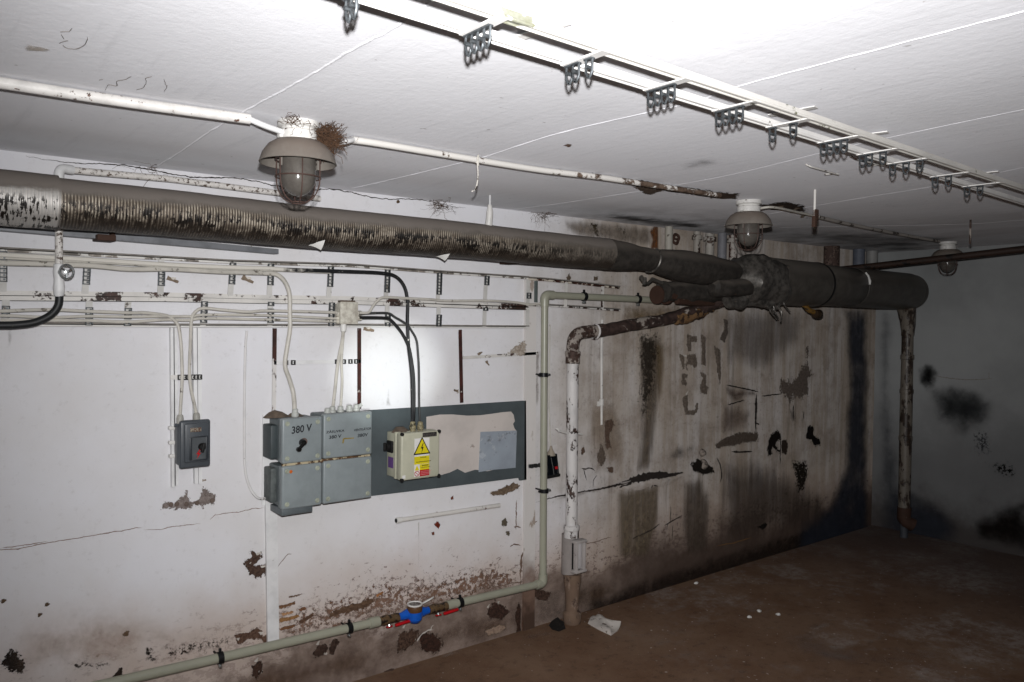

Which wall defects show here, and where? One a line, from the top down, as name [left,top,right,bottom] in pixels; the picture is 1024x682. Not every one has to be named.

peeling [679,319,728,415]
damp [579,313,867,610]
flaking render [162,479,217,510]
peeling [490,483,520,496]
crack [0,508,260,550]
crack [492,467,683,589]
flaking render [243,551,266,580]
flaking render [487,600,521,632]
damp [0,649,25,674]
flaking render [234,627,267,645]
flaking render [313,639,340,658]
flaking render [397,624,443,654]